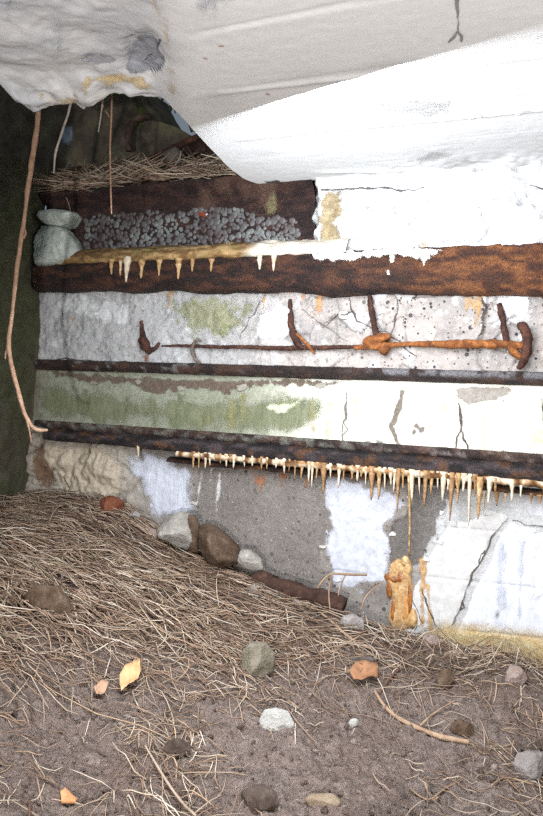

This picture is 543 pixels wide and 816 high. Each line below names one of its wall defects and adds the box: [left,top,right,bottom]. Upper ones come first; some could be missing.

crack [448,0,463,43]
water stain [55,238,440,282]
corrosion [465,296,484,328]
water stain [268,393,333,439]
crack [388,390,404,445]
crack [455,402,469,449]
water stain [30,442,543,556]
peeling [191,466,543,657]
corrosion [384,555,434,631]